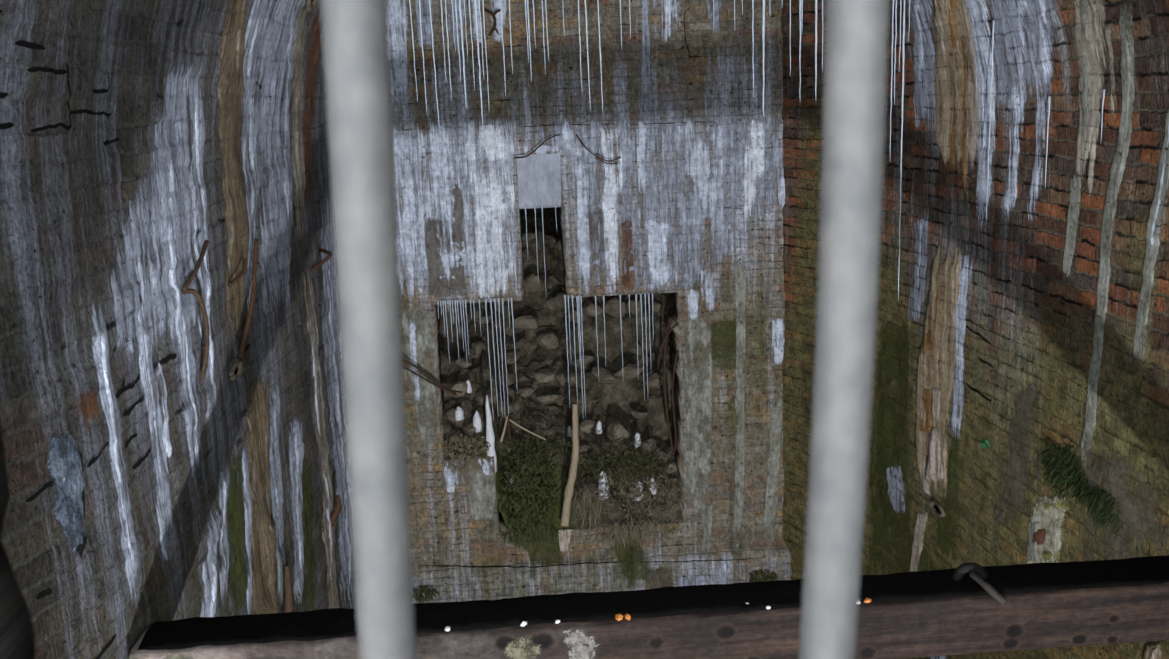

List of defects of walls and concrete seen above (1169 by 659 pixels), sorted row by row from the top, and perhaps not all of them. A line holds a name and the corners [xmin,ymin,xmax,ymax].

spalling [47,434,88,558]
leakage [92,303,140,600]
leakage [139,318,173,560]
leakage [150,0,308,478]
leakage [200,193,355,617]
leakage [425,129,516,297]
leakage [587,128,623,291]
peeling [915,388,947,483]
leakage [951,255,972,435]
leakage [949,0,1026,227]
leakage [1063,0,1135,462]
leakage [1133,109,1169,357]